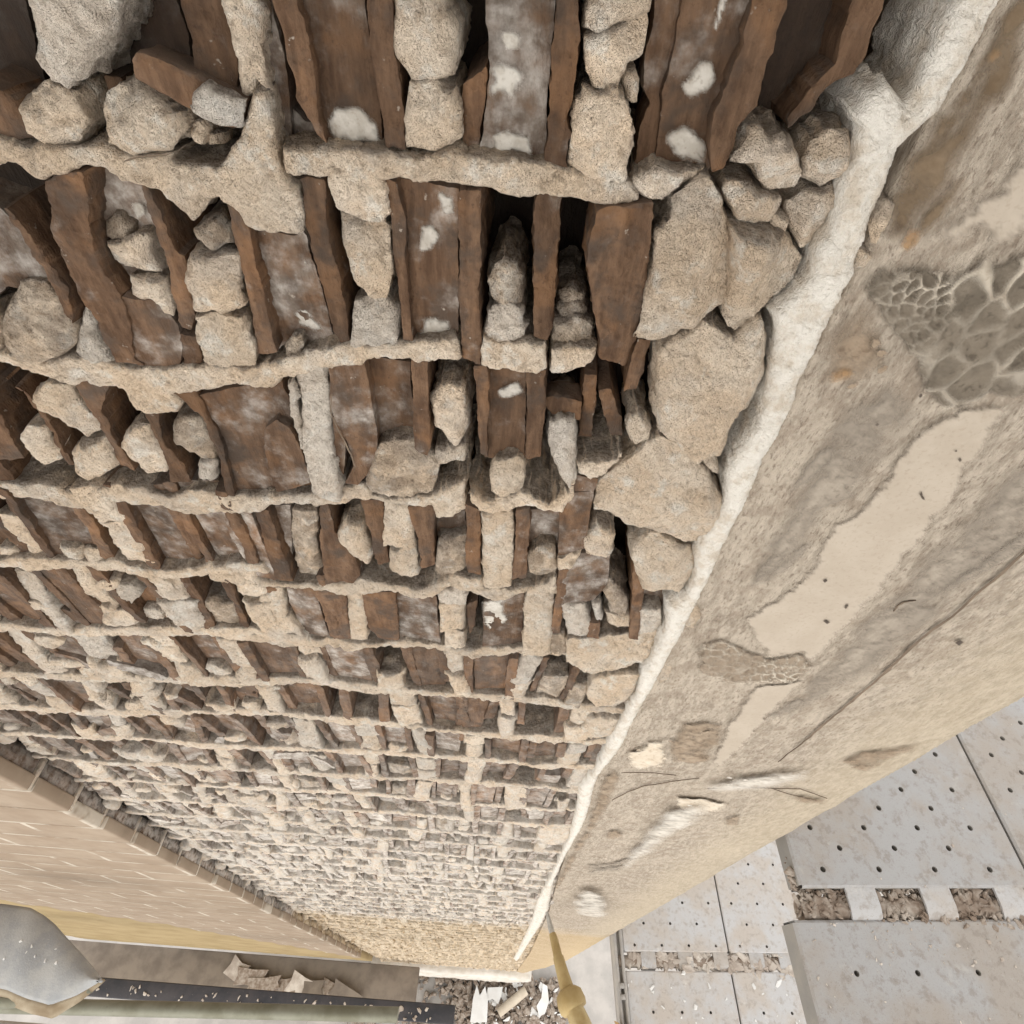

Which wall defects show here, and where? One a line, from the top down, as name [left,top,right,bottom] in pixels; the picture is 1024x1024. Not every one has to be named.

crack [778,552,1024,762]
spalling [628,724,720,769]
crack [613,772,715,800]
peeling [677,799,725,812]
crack [751,787,827,800]
spalling [556,773,619,888]